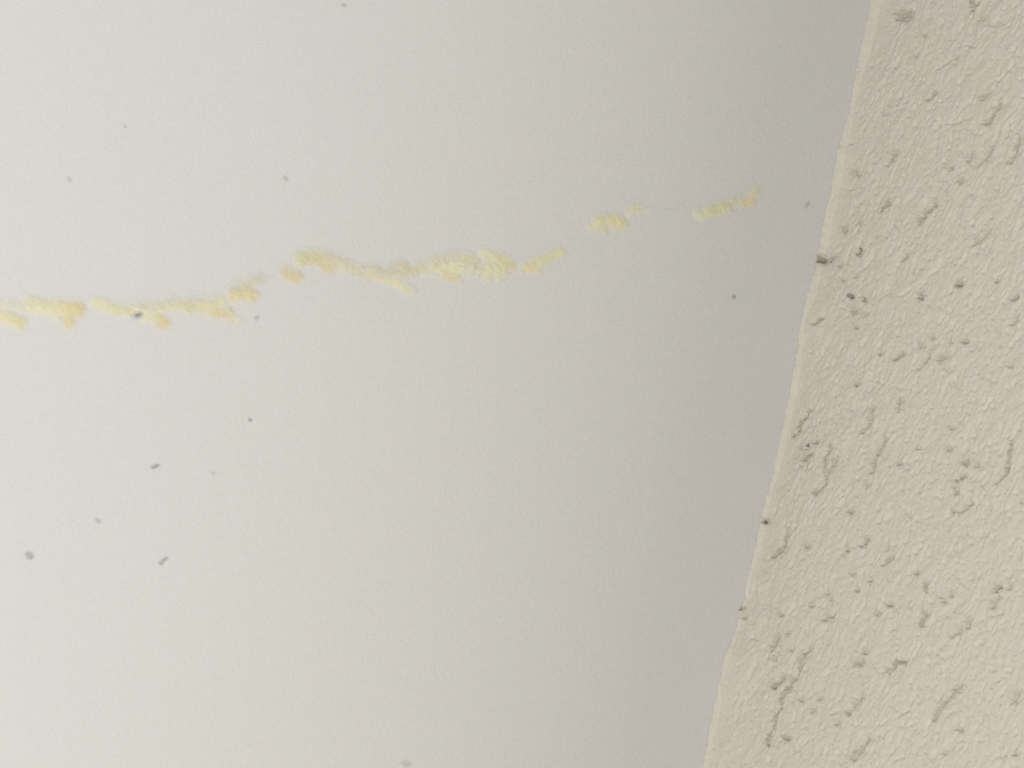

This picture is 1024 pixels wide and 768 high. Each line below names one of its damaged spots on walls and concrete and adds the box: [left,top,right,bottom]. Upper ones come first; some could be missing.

crack [0,183,764,334]